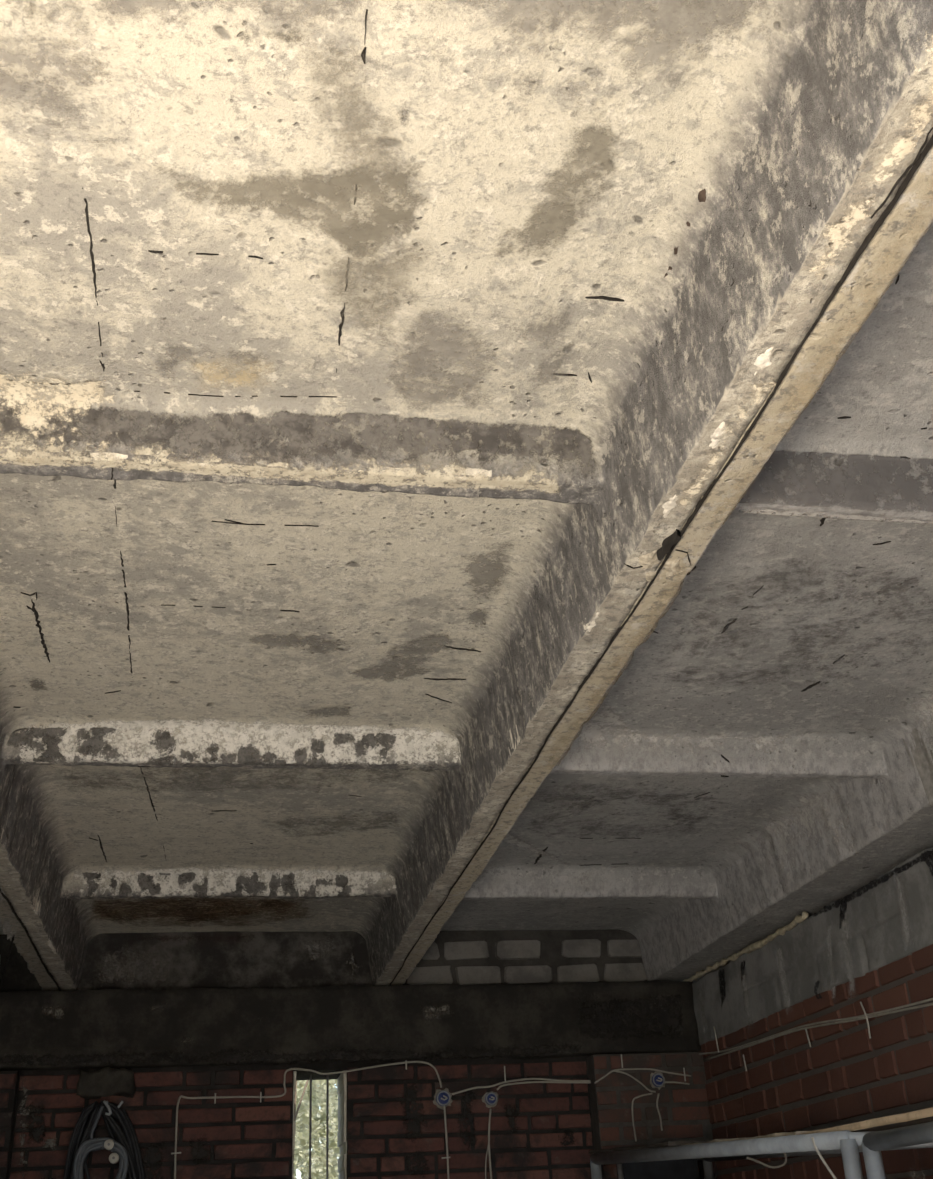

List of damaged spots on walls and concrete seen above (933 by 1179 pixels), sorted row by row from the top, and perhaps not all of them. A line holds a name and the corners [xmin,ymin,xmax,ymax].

crack [360,9,368,64]
water stain [162,49,428,326]
water stain [498,128,616,257]
crack [82,188,105,372]
water stain [0,313,595,479]
crack [212,519,319,527]
crack [389,127,933,985]
crack [21,592,50,662]
water stain [351,635,451,681]
peeling [6,718,461,767]
corrosion [93,898,307,926]
peeling [73,867,396,898]